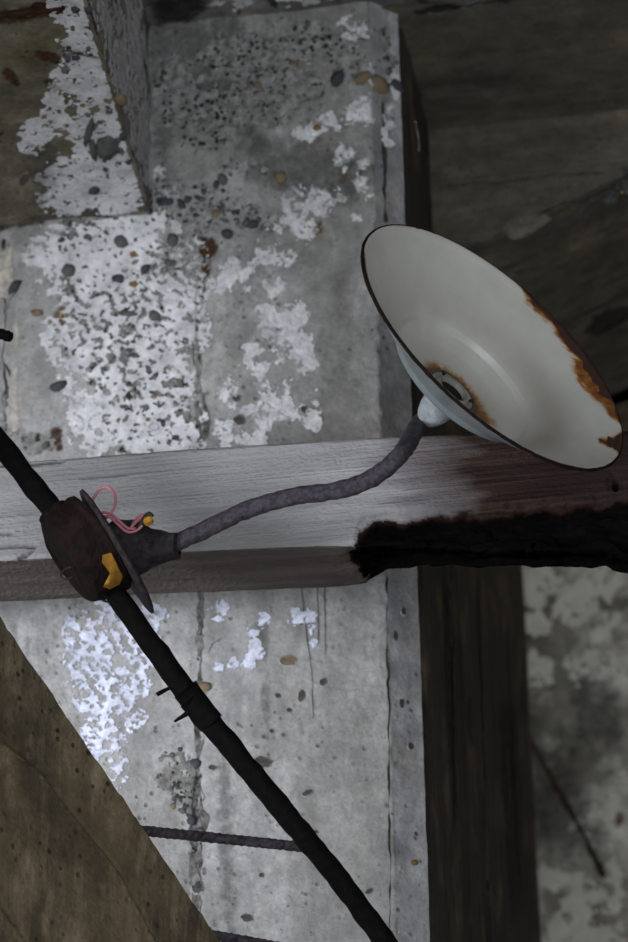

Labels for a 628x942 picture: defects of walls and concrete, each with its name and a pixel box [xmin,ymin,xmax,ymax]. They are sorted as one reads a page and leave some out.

rust [0,5,65,23]
peeling [1,0,404,457]
crack [191,271,211,449]
peeling [62,601,154,790]
peeling [141,603,170,638]
spalling [193,678,212,693]
crack [196,592,220,681]
spalling [154,747,217,896]
crack [188,725,210,911]
spalling [239,913,255,924]